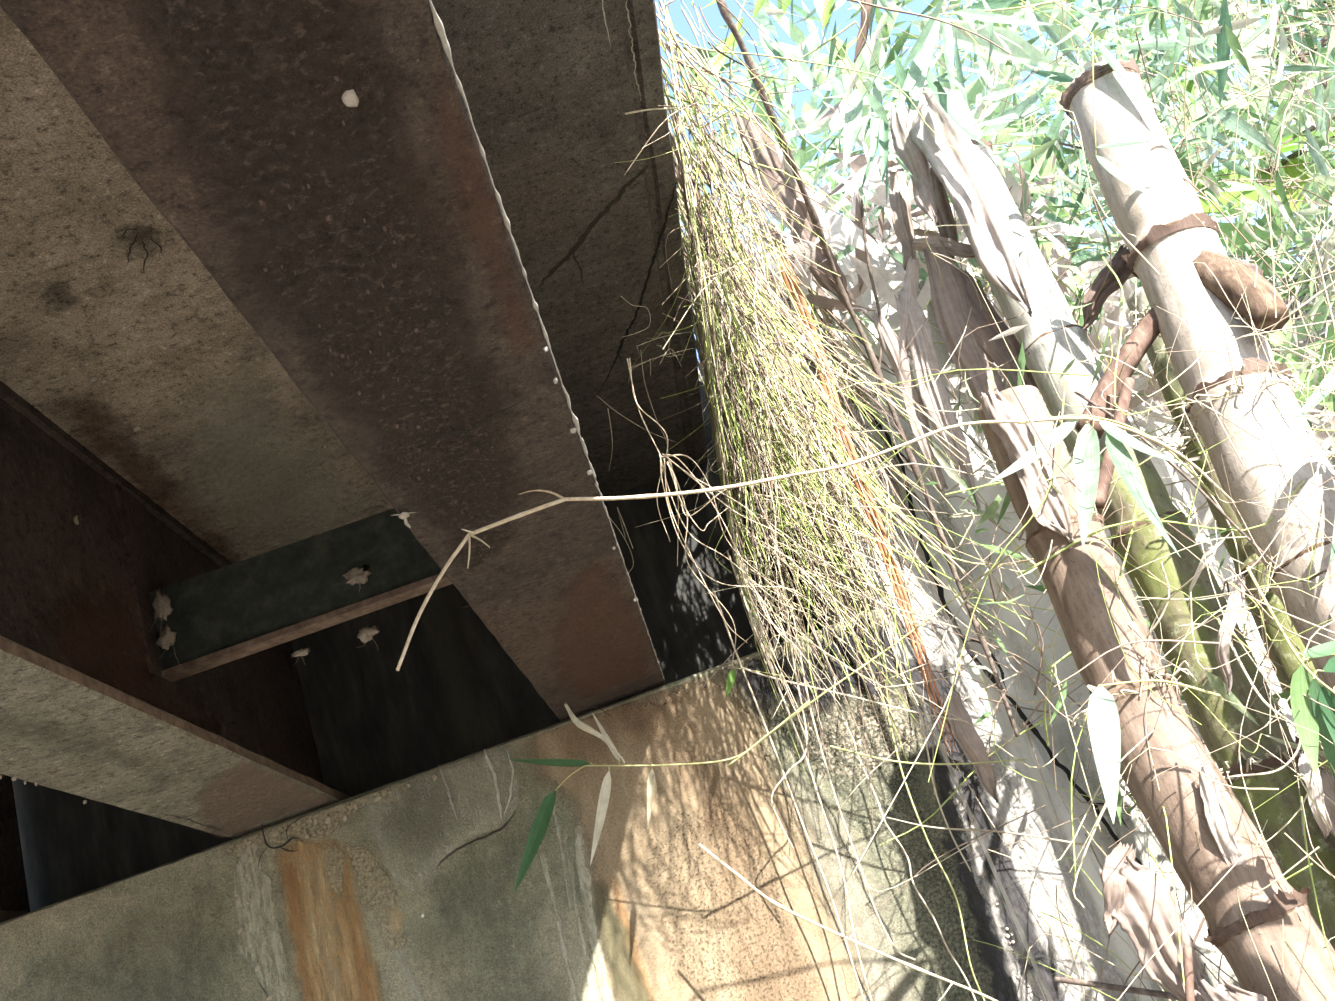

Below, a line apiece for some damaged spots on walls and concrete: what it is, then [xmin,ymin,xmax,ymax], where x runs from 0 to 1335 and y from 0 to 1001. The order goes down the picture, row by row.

crack [538,166,648,289]
crack [597,181,677,394]
water stain [429,0,1063,1001]
rust [279,839,381,1001]